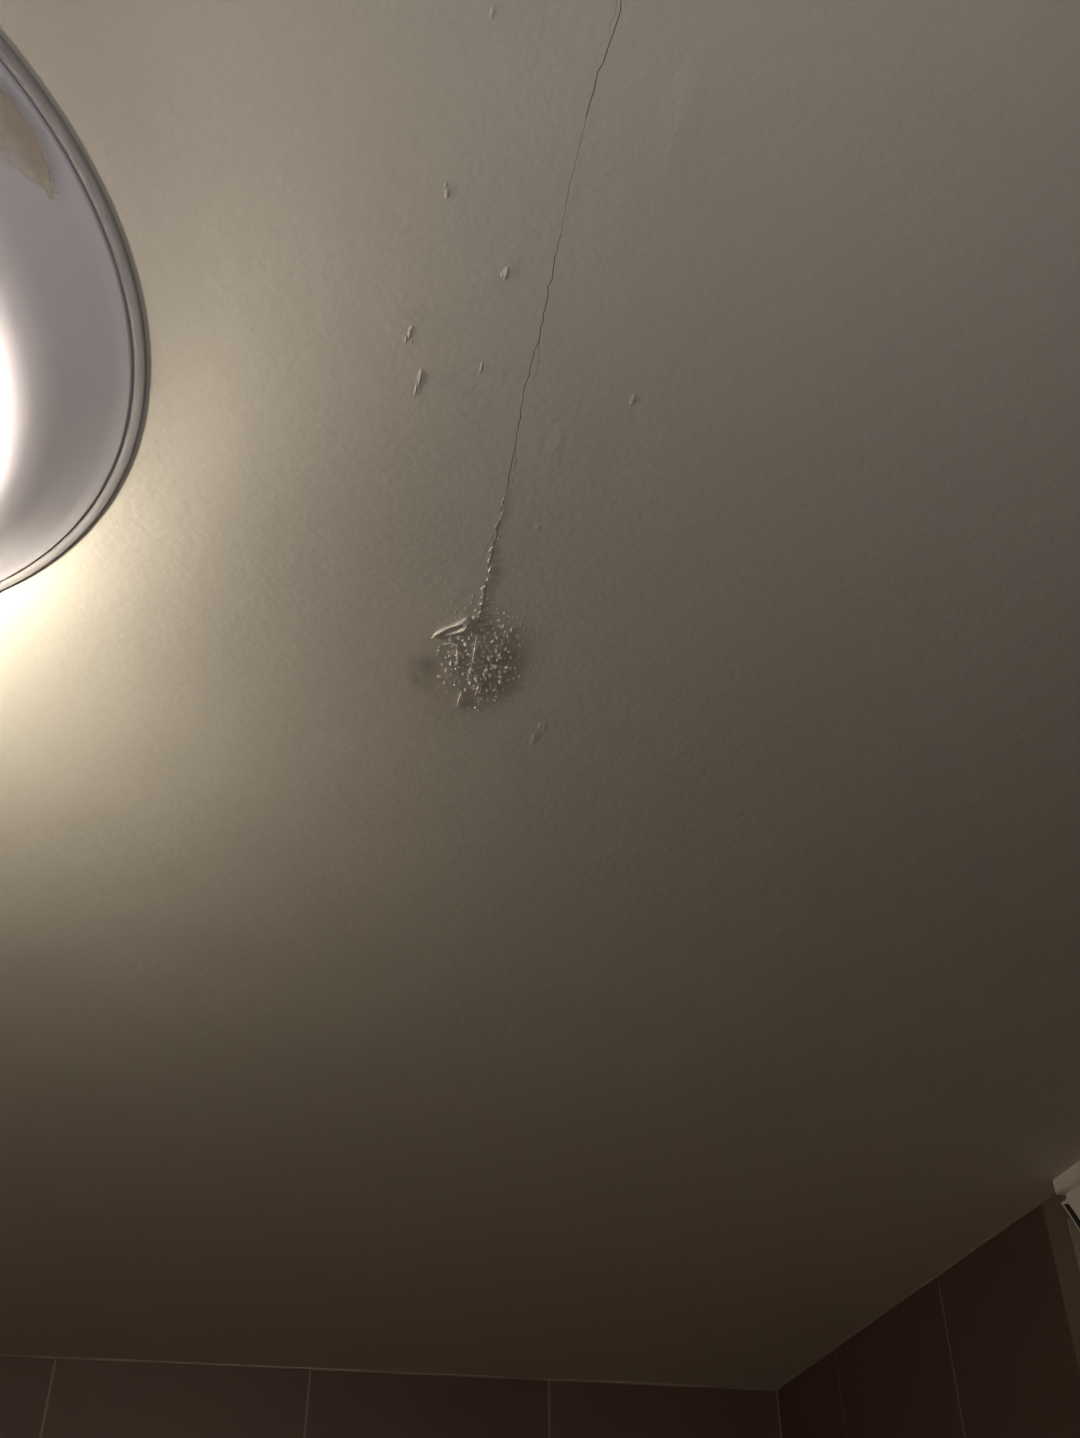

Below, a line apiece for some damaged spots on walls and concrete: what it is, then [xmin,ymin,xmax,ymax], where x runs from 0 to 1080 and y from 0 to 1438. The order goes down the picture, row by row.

crack [478,2,621,622]
peeling [413,592,542,717]